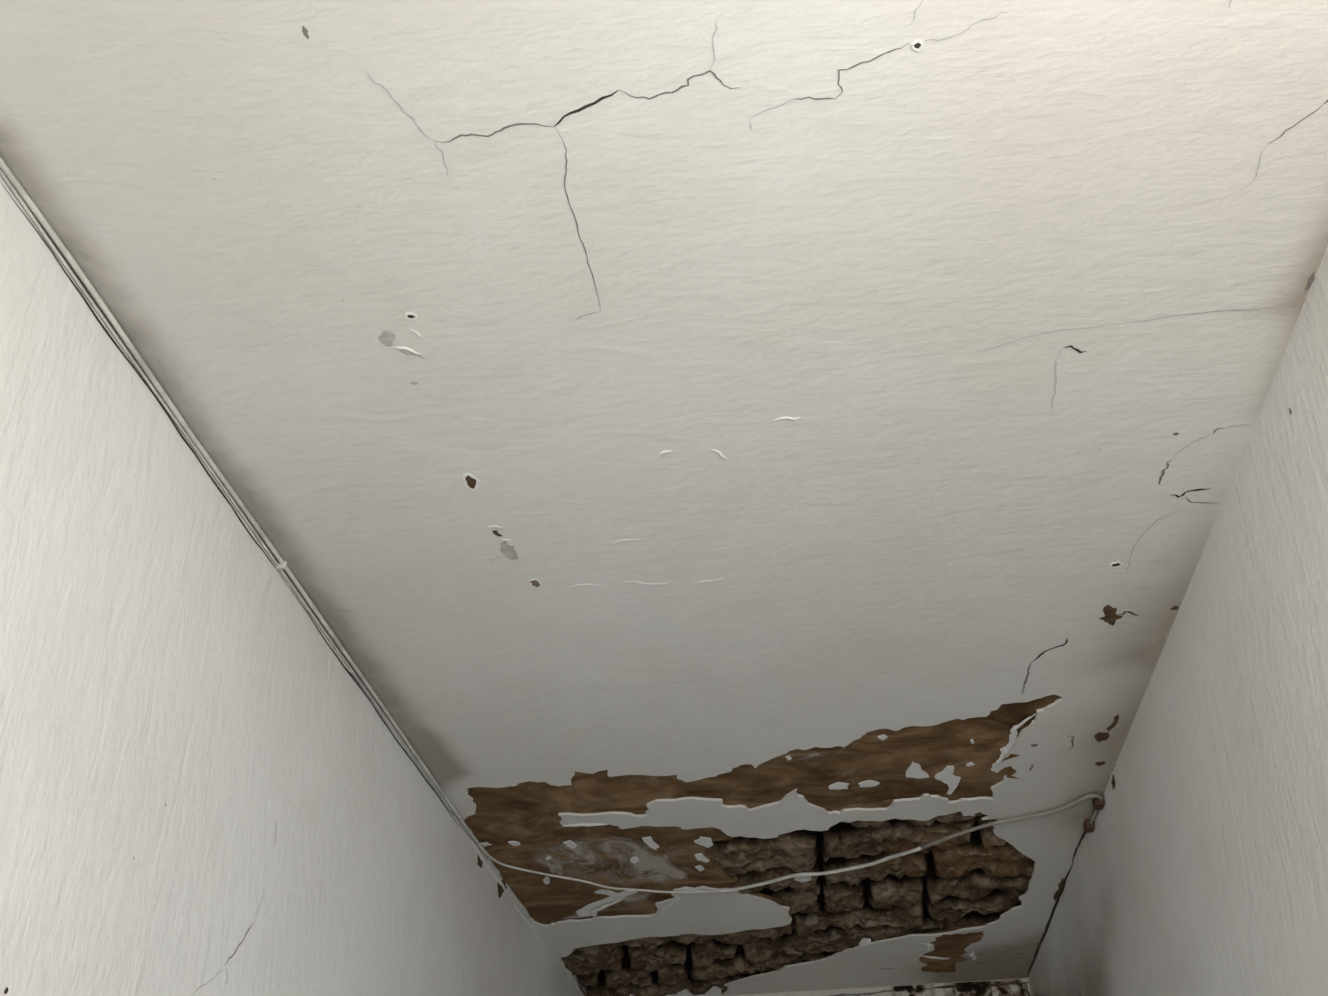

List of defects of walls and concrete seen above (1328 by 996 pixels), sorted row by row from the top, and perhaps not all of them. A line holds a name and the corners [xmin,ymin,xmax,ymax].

crack [366,0,1008,321]
crack [1250,100,1328,184]
crack [1022,638,1068,695]
flaking render [1099,605,1138,626]
water stain [1141,606,1179,667]
water stain [1095,713,1136,795]
peeling [464,695,1062,996]
water stain [893,985,926,996]
water stain [942,941,1043,996]